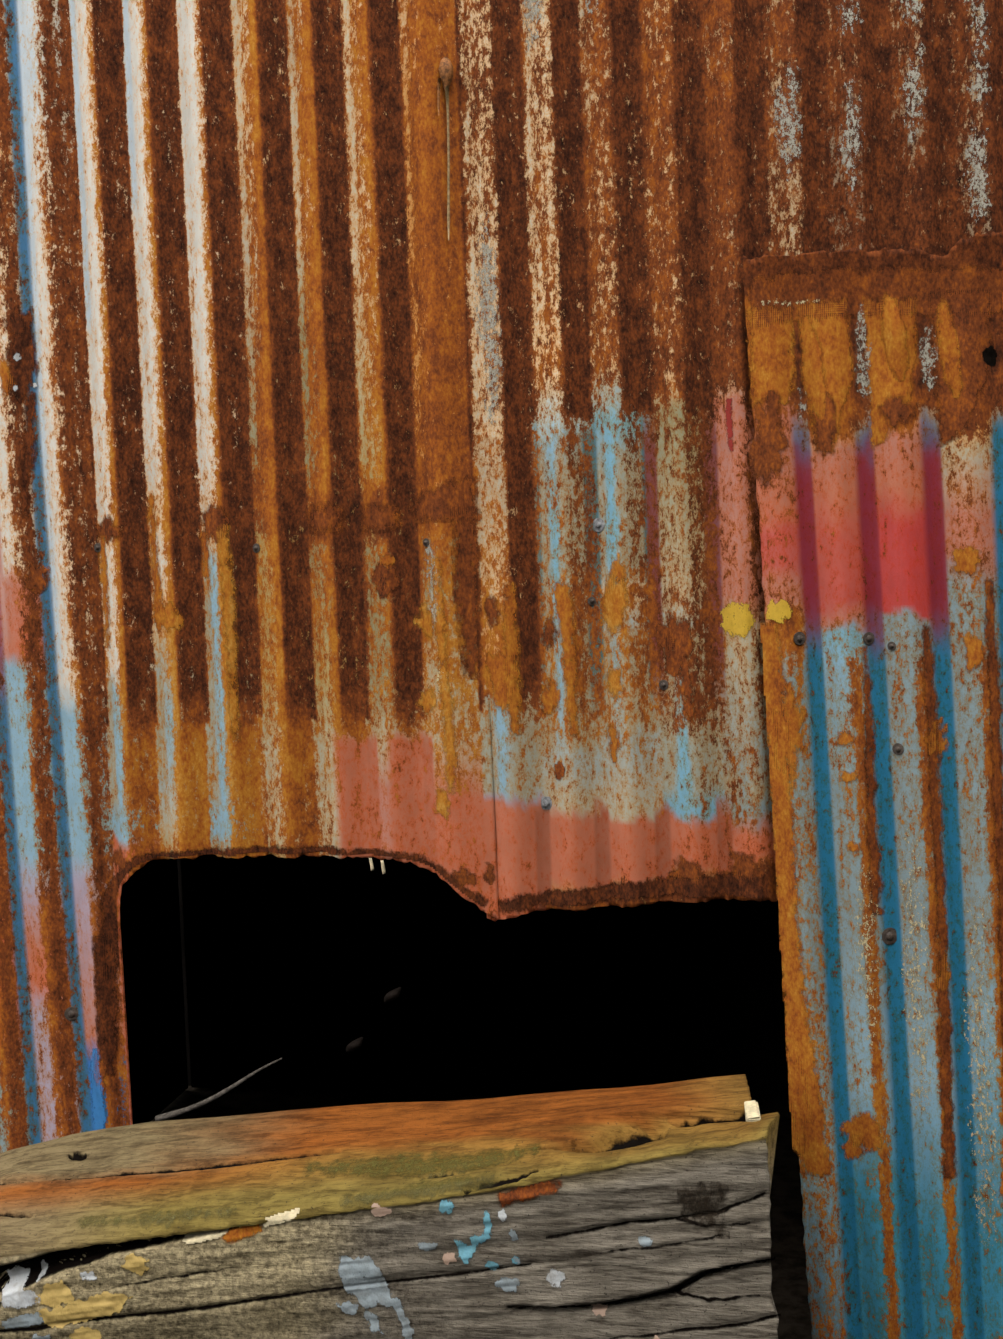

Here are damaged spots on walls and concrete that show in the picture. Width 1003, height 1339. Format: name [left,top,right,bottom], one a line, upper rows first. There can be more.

rust [0,305,39,519]
peeling [854,304,872,397]
rust [746,265,1003,486]
peeling [919,327,938,392]
rust [94,516,122,647]
rust [147,493,184,632]
rust [199,504,240,740]
rust [360,476,523,818]
rust [541,582,578,736]
rust [92,612,884,1177]
rust [921,625,957,1179]
rust [952,545,1003,1045]